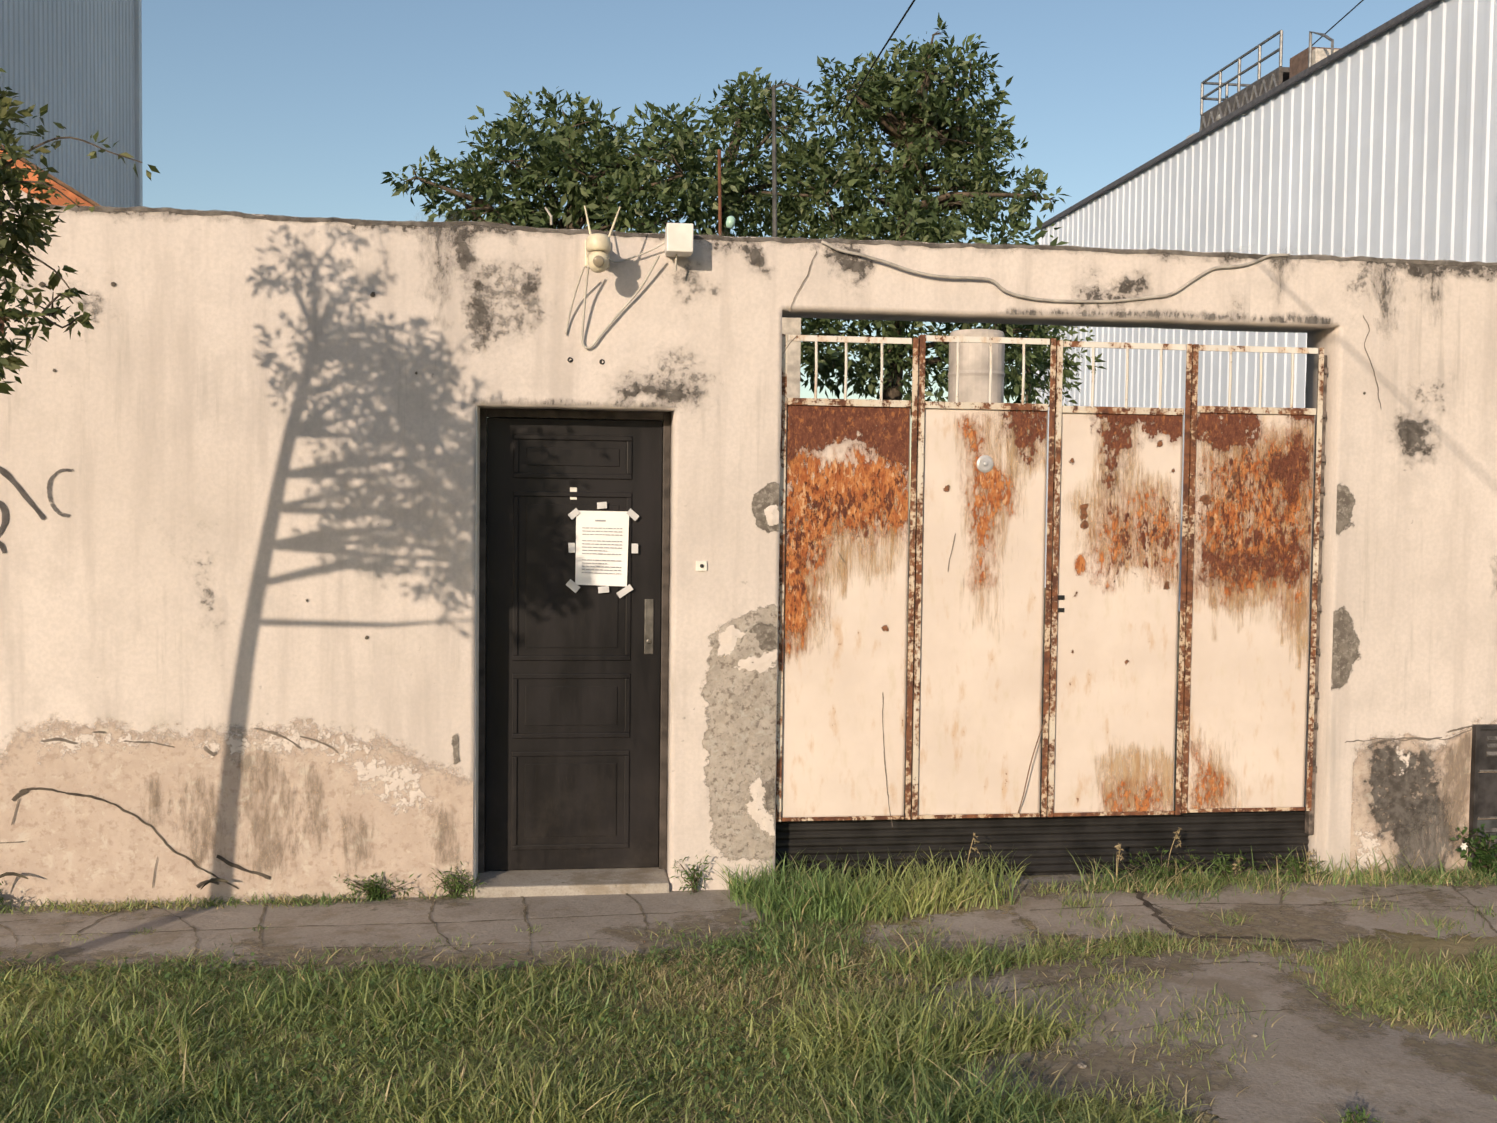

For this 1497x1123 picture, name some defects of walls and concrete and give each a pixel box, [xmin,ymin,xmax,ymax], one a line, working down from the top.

damp [44,203,665,349]
damp [693,235,1497,317]
damp [618,352,706,403]
corrosion [784,405,910,657]
corrosion [943,410,1047,585]
corrosion [1074,413,1314,661]
damp [1397,416,1435,461]
spalling [1331,606,1360,690]
crack [0,787,271,889]
peeling [0,718,473,906]
spalling [701,604,778,862]
peeling [1350,720,1496,874]